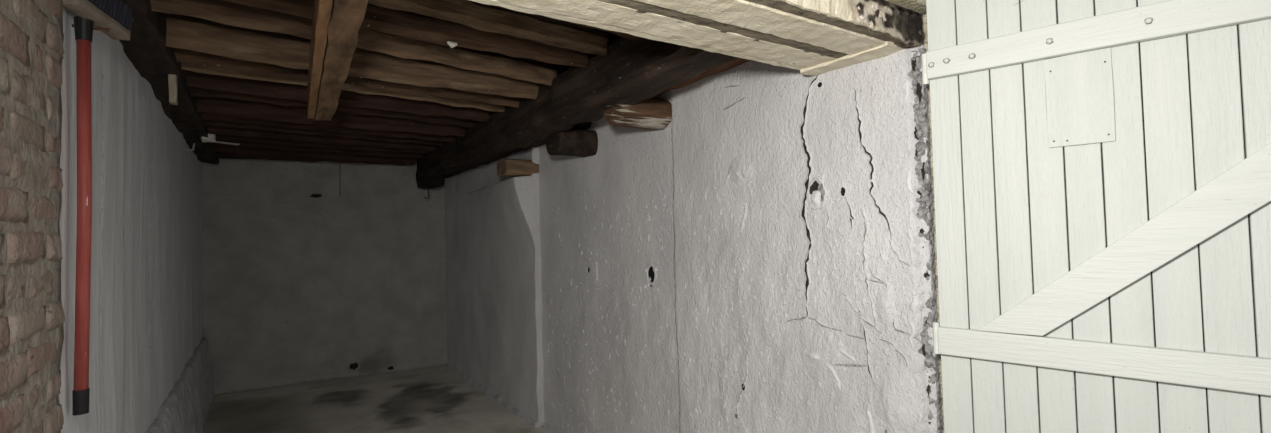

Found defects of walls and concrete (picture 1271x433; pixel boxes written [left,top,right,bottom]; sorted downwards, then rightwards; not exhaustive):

flaking render [807,176,847,210]
crack [786,75,922,385]
spalling [848,0,943,433]